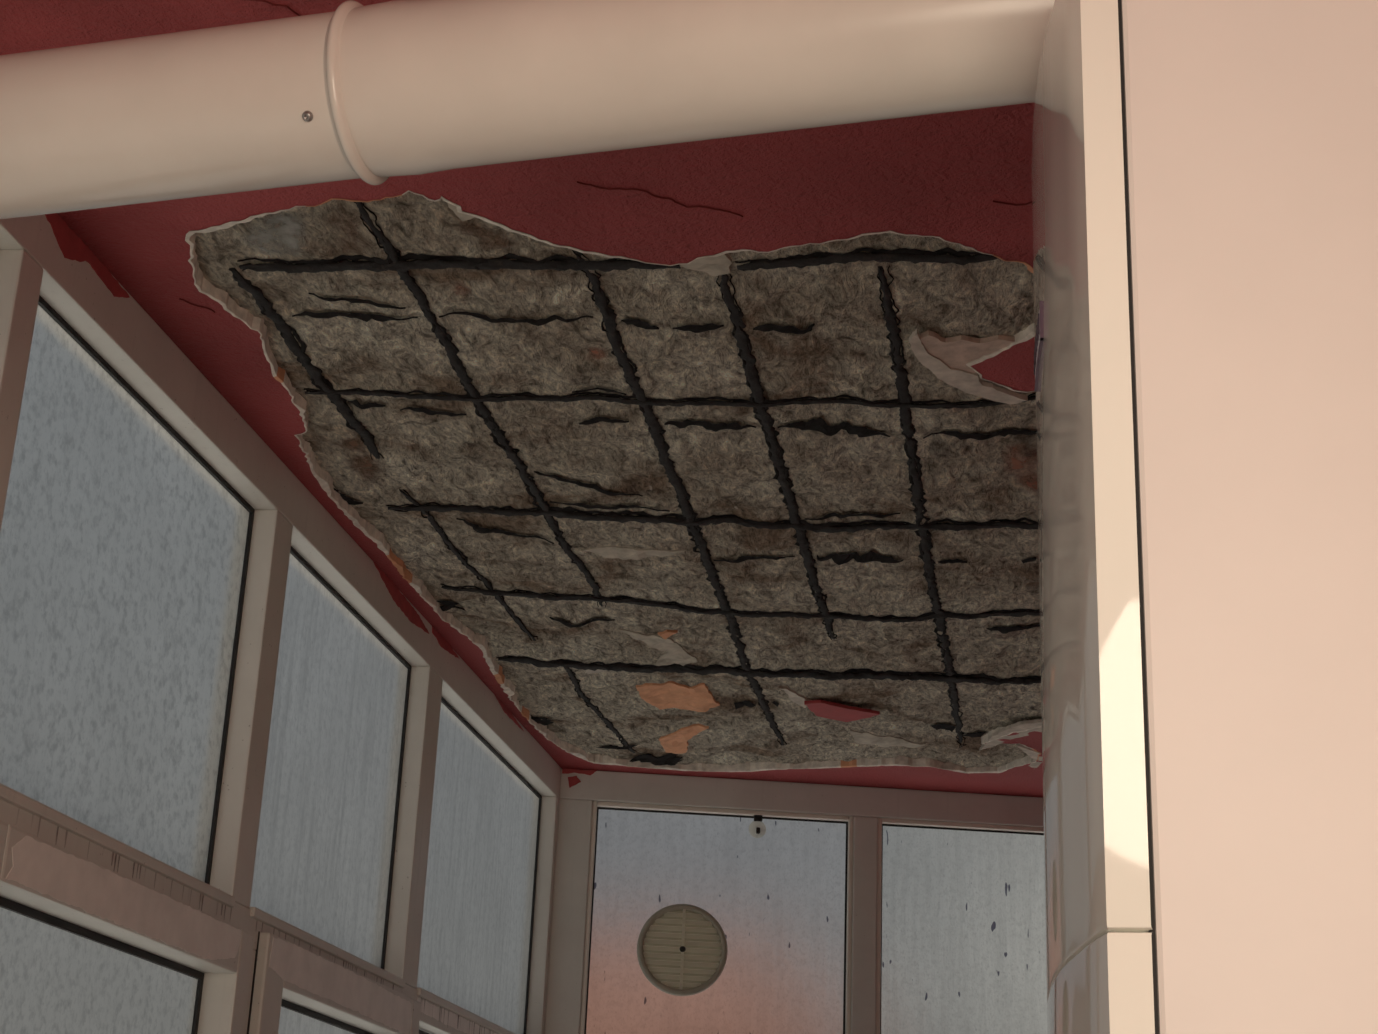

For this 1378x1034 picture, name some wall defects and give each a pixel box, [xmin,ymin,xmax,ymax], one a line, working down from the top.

crack [256,0,300,16]
crack [577,181,743,217]
spalling [185,190,1042,788]